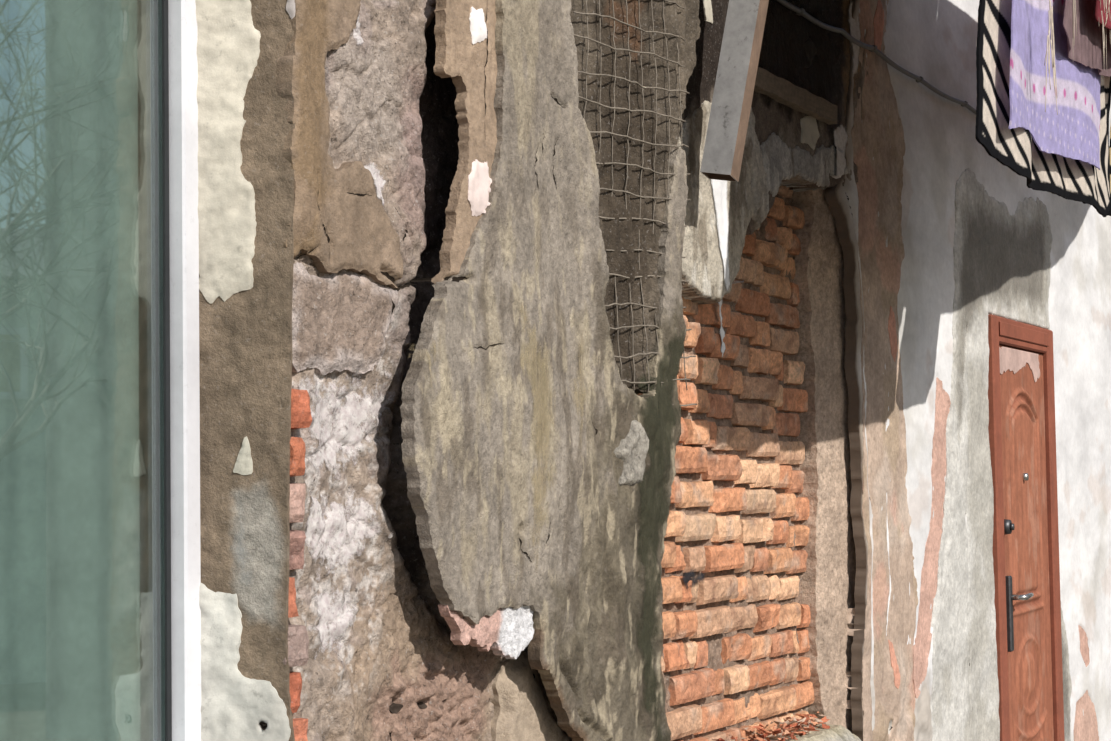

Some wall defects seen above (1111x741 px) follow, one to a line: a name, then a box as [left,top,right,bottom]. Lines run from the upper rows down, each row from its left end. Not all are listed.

flaking render [195,0,508,741]
flaking render [536,670,572,741]
spalling [570,0,713,392]
spalling [660,186,830,741]
peeling [846,0,951,741]
peeling [1078,625,1090,667]
peeling [1073,690,1099,741]